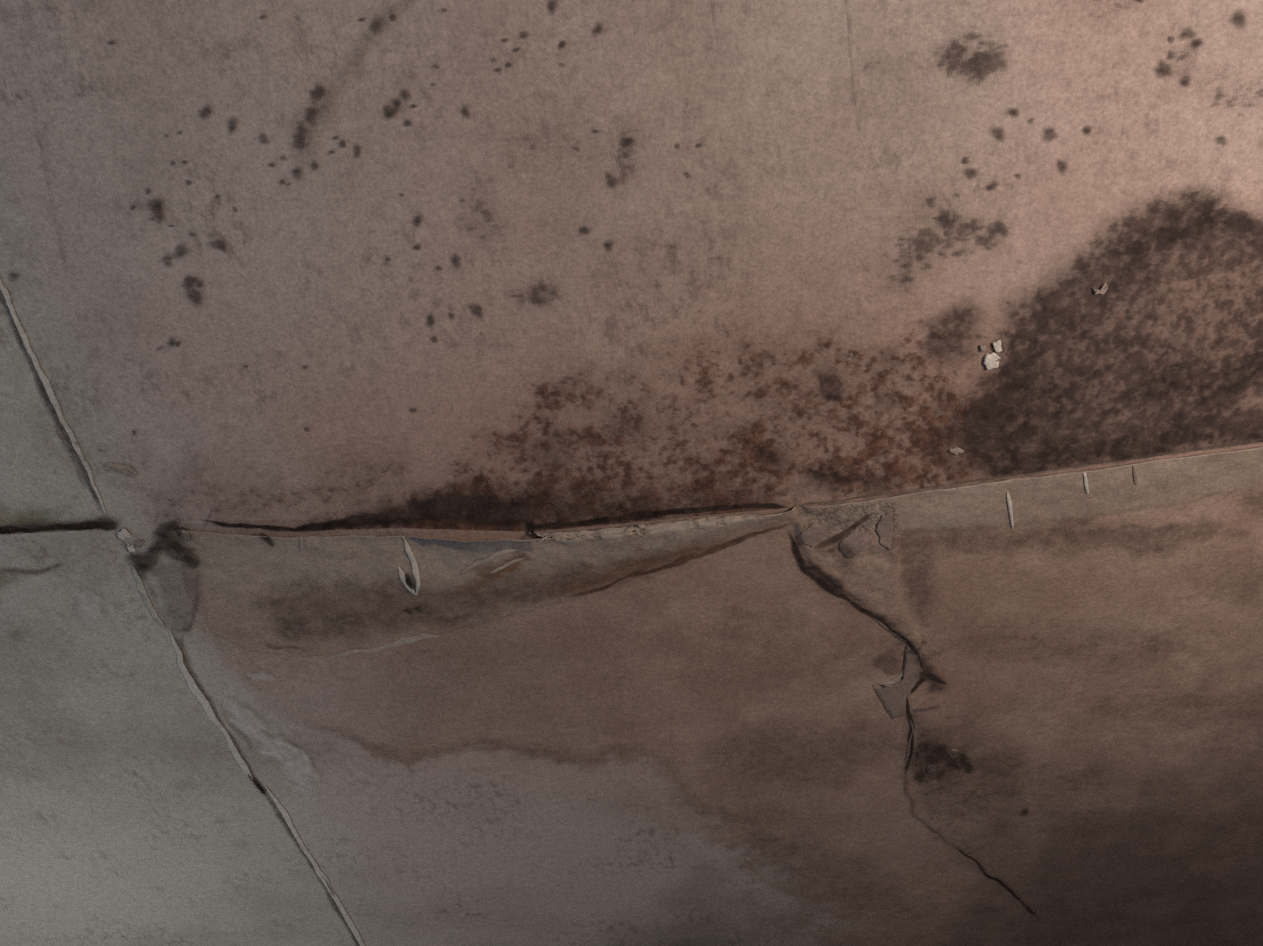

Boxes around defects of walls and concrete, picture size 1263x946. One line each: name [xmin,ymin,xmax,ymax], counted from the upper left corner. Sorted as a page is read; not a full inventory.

damp [938,33,1008,81]
damp [1158,31,1202,85]
damp [270,86,326,186]
damp [386,91,417,126]
crack [0,280,365,946]
damp [155,191,1263,946]
crack [206,439,1259,917]